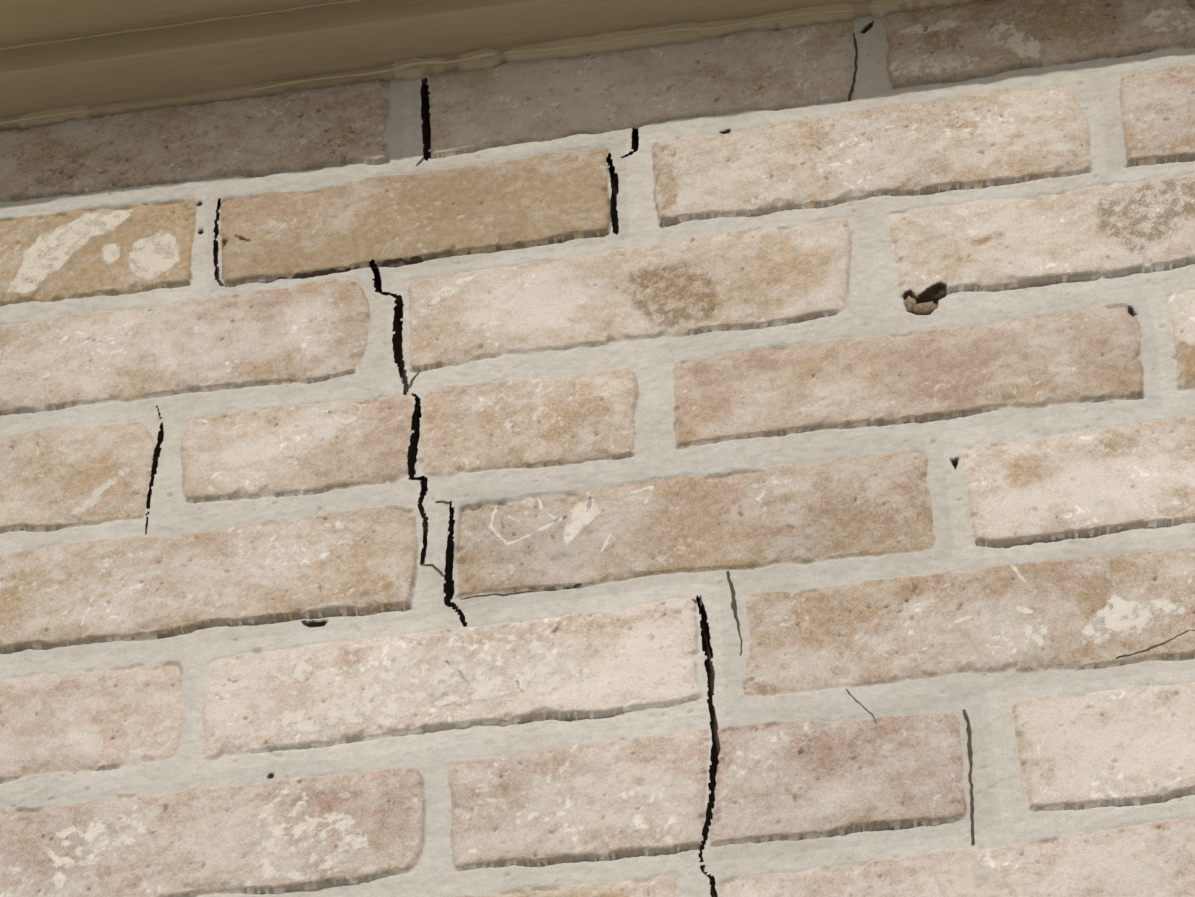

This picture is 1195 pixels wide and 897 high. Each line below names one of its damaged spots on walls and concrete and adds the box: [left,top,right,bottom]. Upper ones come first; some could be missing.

crack [416,85,431,166]
crack [606,133,638,235]
crack [145,409,164,535]
crack [264,242,581,627]
crack [692,571,742,897]